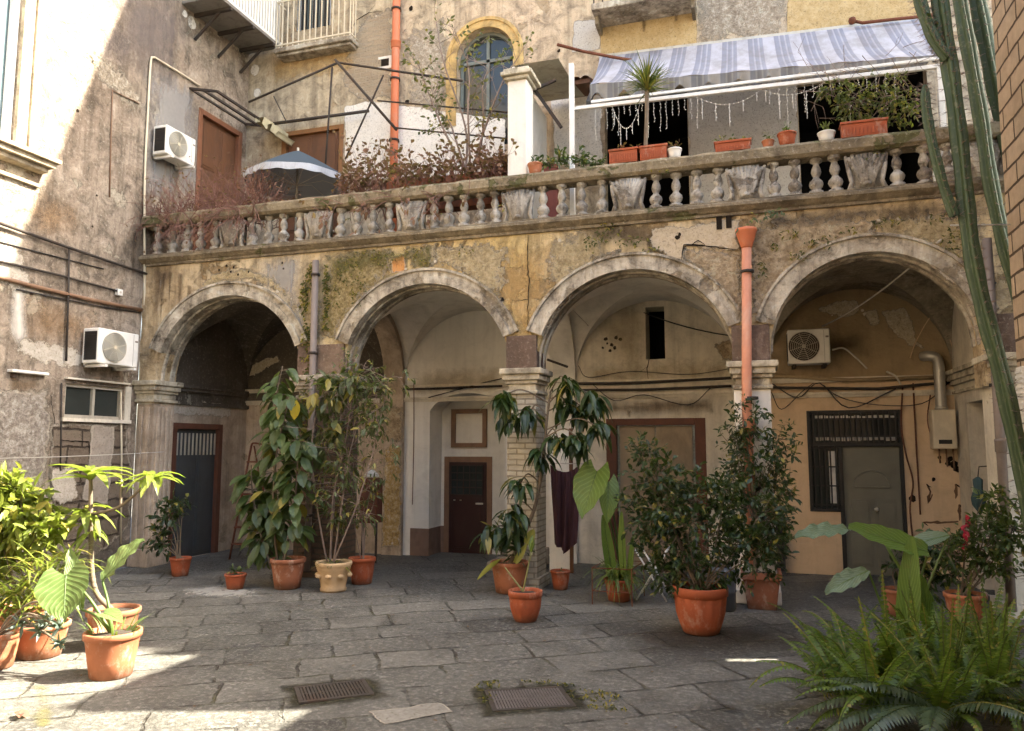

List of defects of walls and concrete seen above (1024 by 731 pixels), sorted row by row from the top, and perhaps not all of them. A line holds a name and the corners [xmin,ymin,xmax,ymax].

water stain [266,261,295,293]
crack [517,243,530,326]
spalling [545,229,615,284]
spalling [675,209,963,317]
flaking render [818,300,924,349]